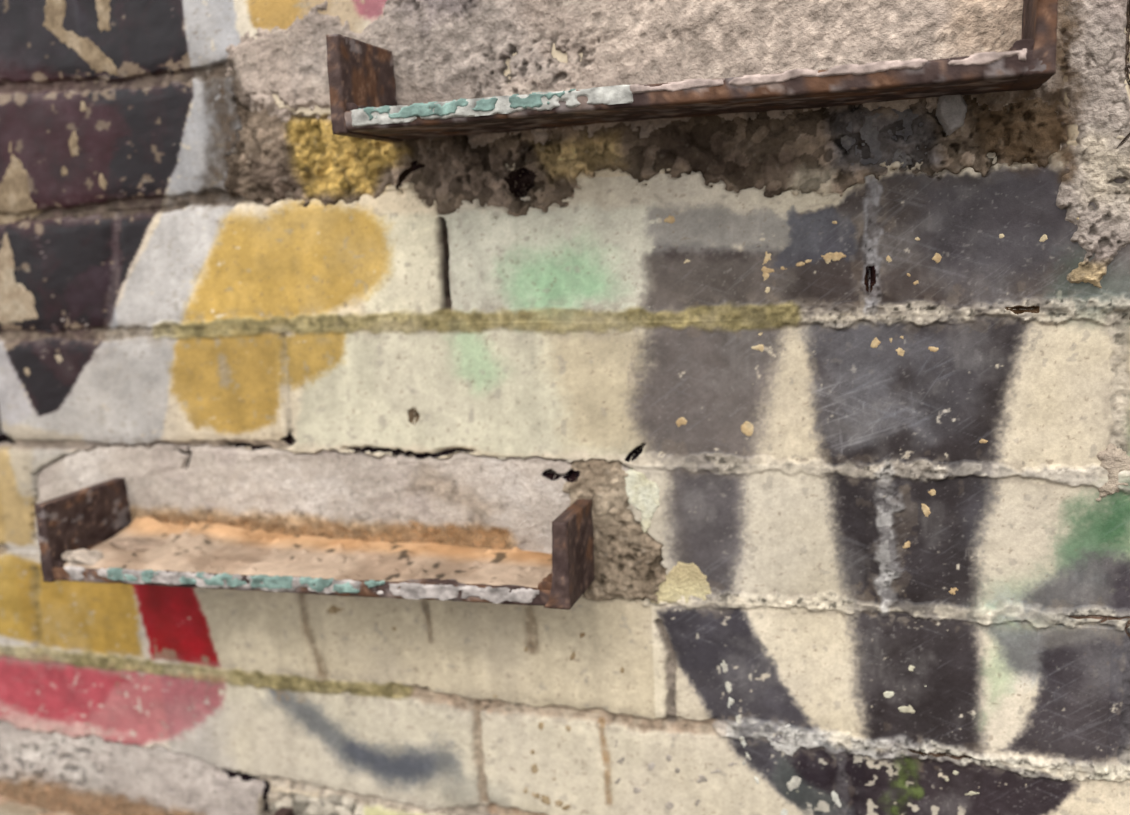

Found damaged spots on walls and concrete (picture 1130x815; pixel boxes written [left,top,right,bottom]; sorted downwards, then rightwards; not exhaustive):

crack [1122,0,1130,88]
spalling [225,0,1069,217]
rust [978,0,1080,180]
peeling [761,251,846,293]
rust [161,516,507,549]
peeling [625,468,660,533]
peeling [696,660,751,784]
peeling [883,691,915,714]
rust [0,780,184,815]
peeling [787,776,801,791]